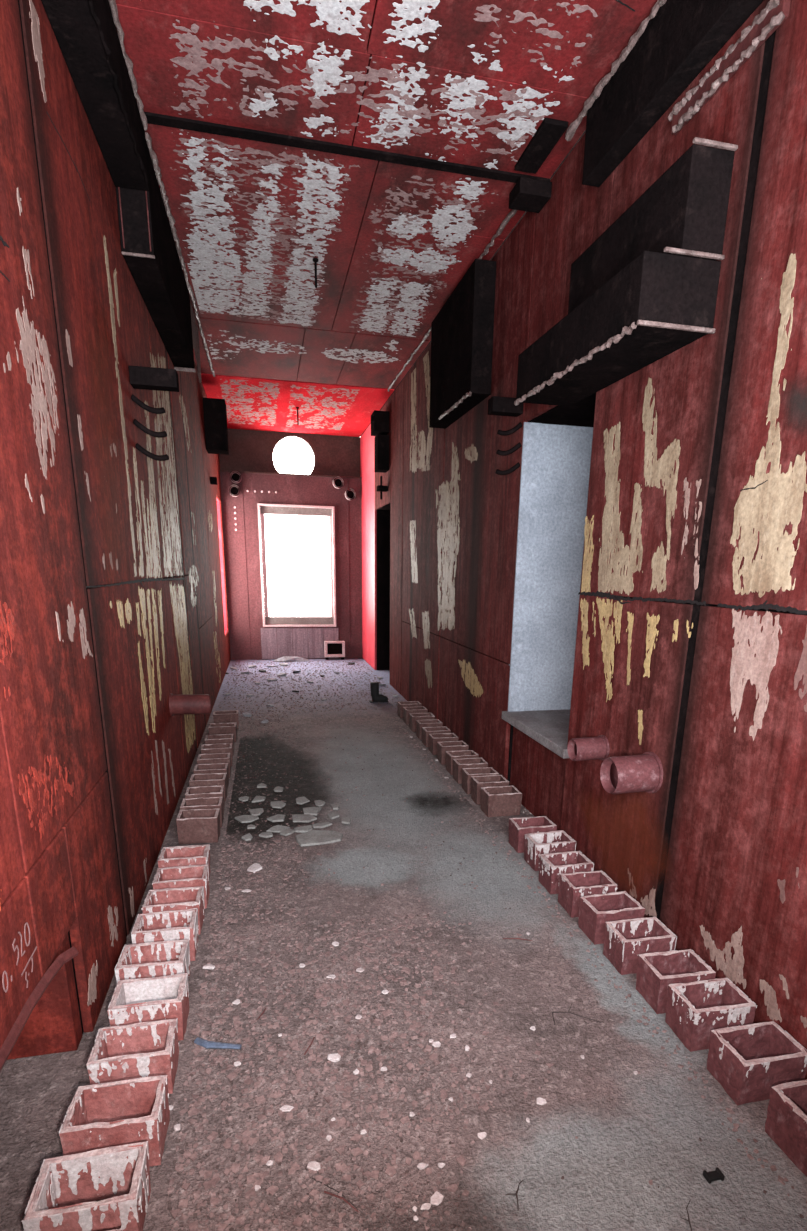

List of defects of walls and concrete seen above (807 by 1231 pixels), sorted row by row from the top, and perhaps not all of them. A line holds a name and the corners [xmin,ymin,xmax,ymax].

peeling [168,0,598,363]
peeling [3,247,59,514]
peeling [103,235,221,815]
peeling [220,379,359,430]
peeling [410,351,433,473]
peeling [409,442,478,689]
peeling [459,660,483,697]
peeling [580,378,702,702]
peeling [730,609,782,741]
peeling [730,253,807,598]
peeling [794,628,807,712]
peeling [700,925,789,1022]